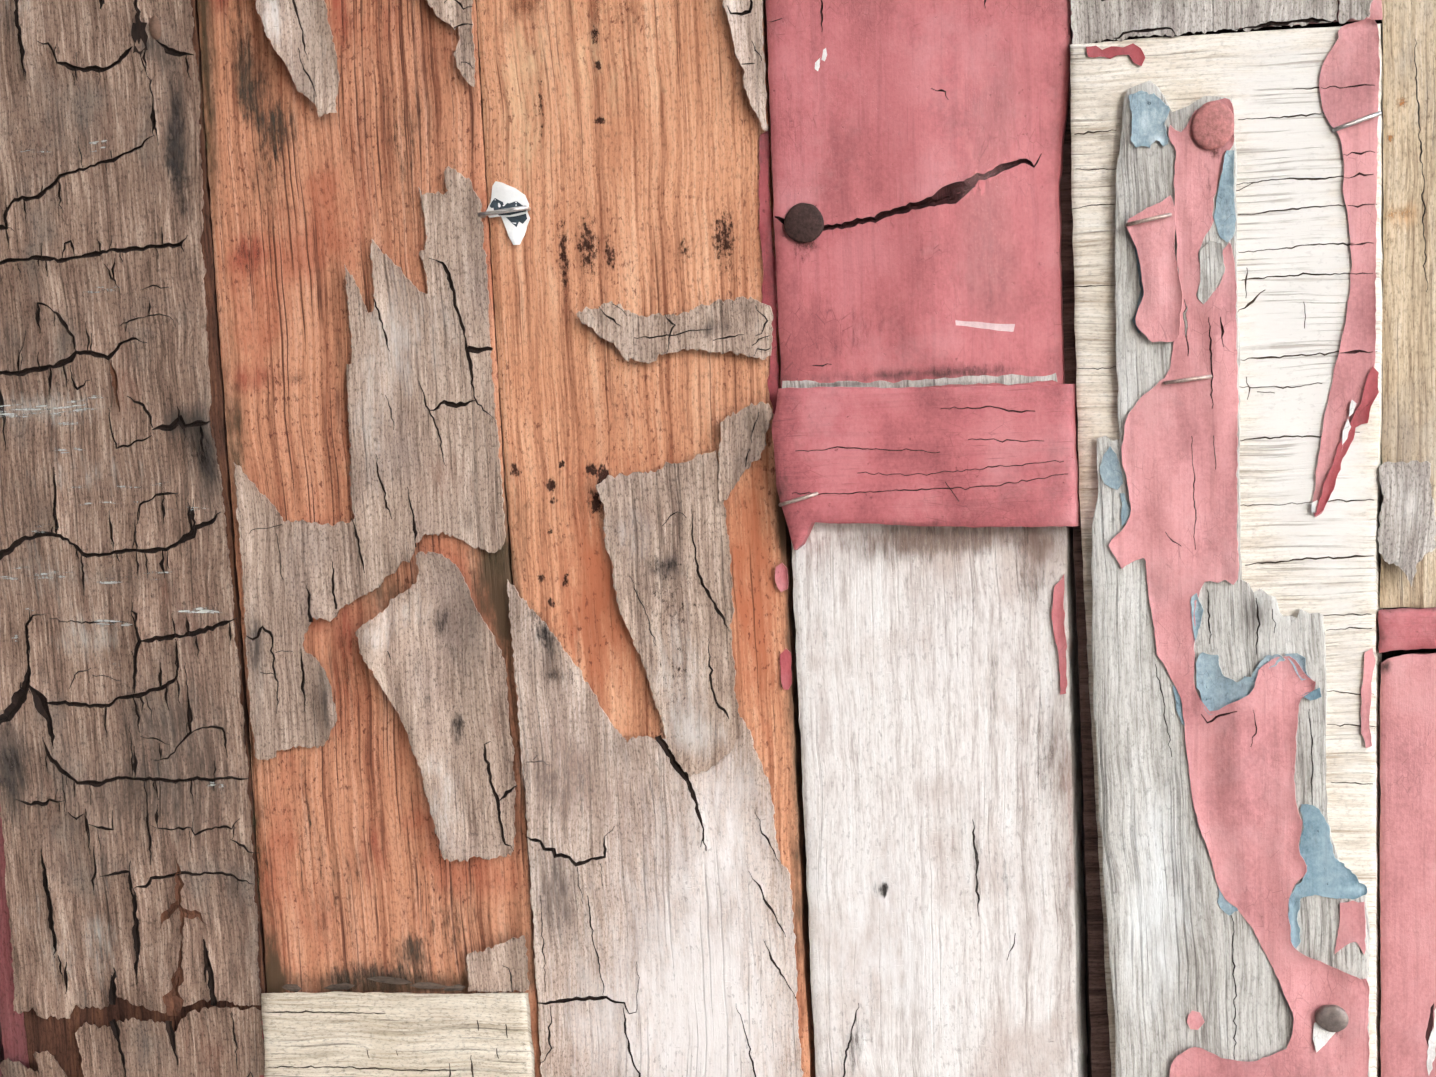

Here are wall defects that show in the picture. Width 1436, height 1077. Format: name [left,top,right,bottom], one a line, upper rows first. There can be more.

peeling [1086,43,1145,66]
crack [0,0,210,456]
crack [823,154,1041,231]
crack [1074,130,1117,171]
peeling [1311,19,1380,517]
crack [374,258,493,547]
peeling [775,563,789,592]
peeling [1100,90,1370,1077]
peeling [780,649,792,690]
peeling [1360,648,1376,748]
crack [0,468,499,1077]